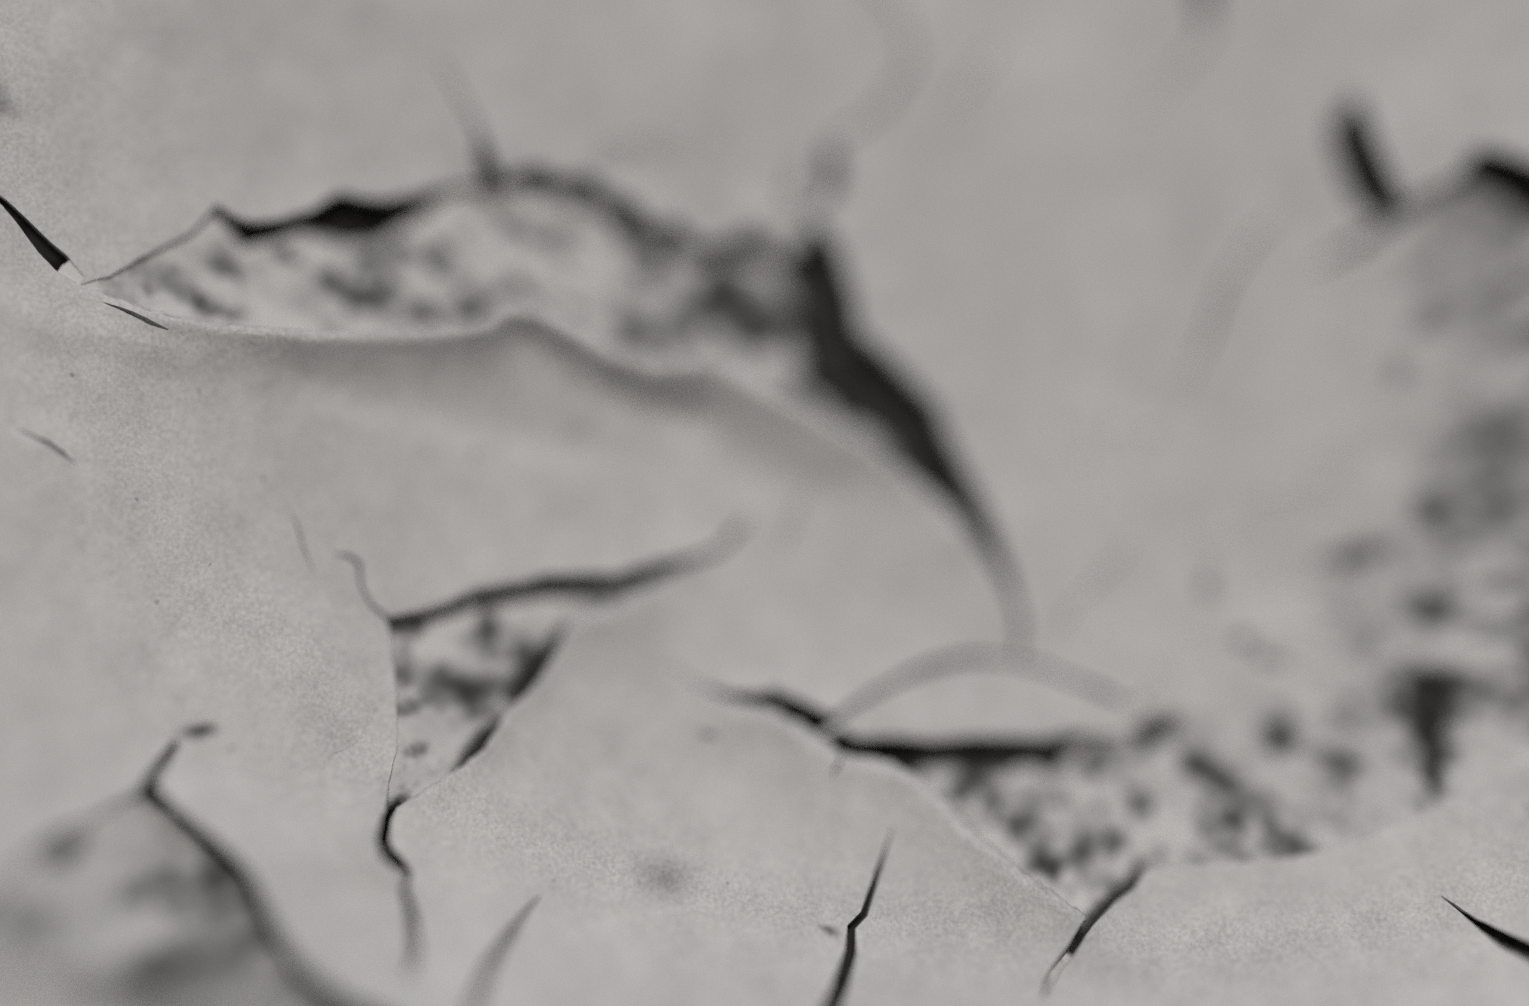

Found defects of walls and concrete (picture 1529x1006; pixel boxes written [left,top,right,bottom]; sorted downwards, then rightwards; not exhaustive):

peeling [58,260,84,284]
peeling [333,509,750,982]
peeling [72,56,1024,664]
peeling [664,94,1529,1000]